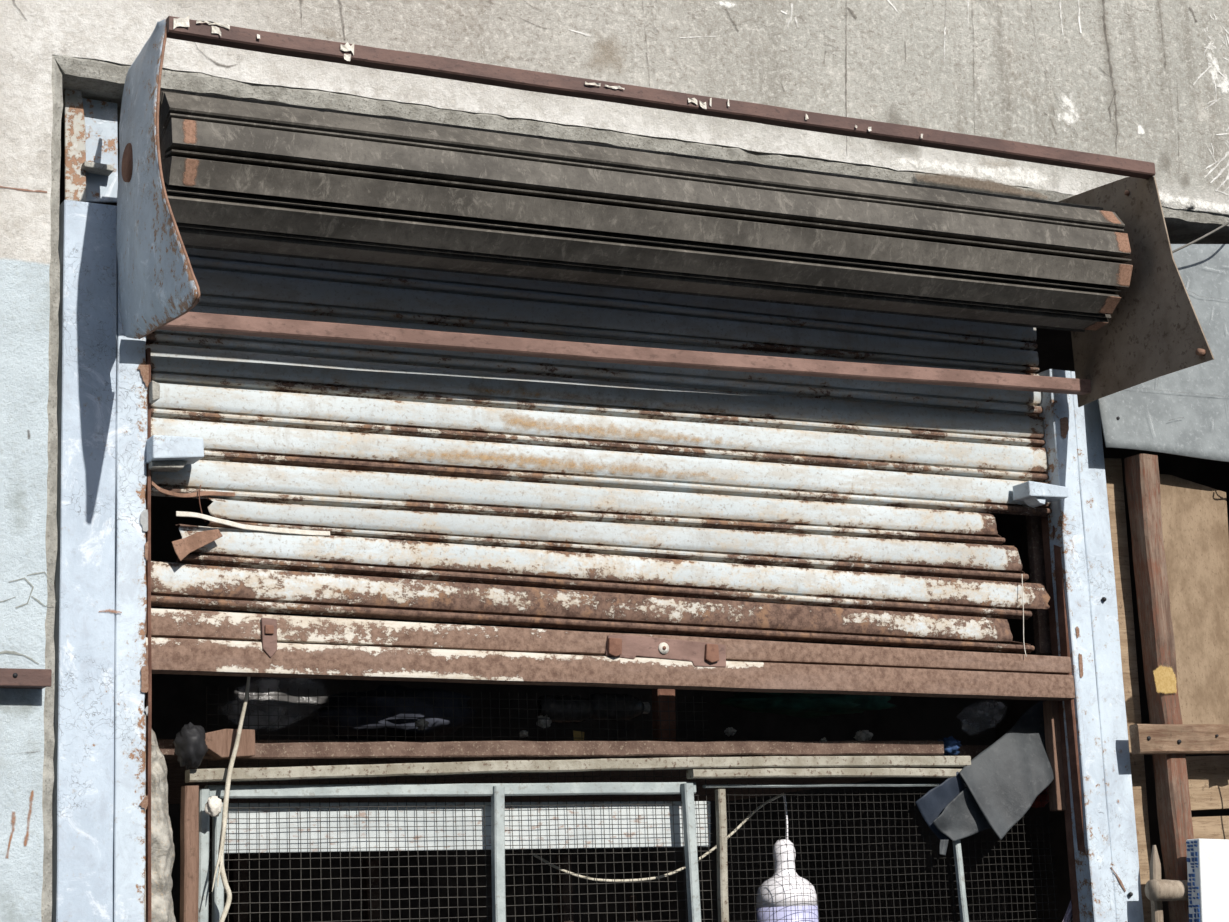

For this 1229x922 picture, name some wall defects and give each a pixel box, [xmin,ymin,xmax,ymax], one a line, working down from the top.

spalling [1189,7,1229,93]
crack [1100,0,1118,154]
corrosion [510,418,642,437]
corrosion [410,451,666,474]
crack [0,571,56,608]
crack [0,650,39,664]
corrosion [6,790,34,858]